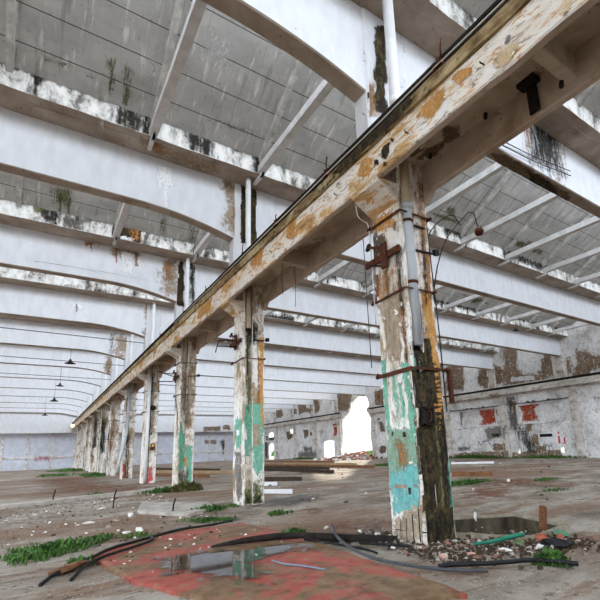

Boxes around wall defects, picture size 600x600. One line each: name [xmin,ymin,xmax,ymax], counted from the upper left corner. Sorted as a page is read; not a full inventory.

leakage [318,25,415,193]
peeling [416,87,447,119]
peeling [357,138,394,180]
leakage [490,125,570,201]
leakage [222,180,257,244]
peeling [372,210,395,258]
corrosion [421,255,443,430]
peeling [477,349,554,389]
peeling [564,348,600,376]
peeling [203,402,264,501]
peeling [374,294,427,542]
peeling [447,404,562,509]